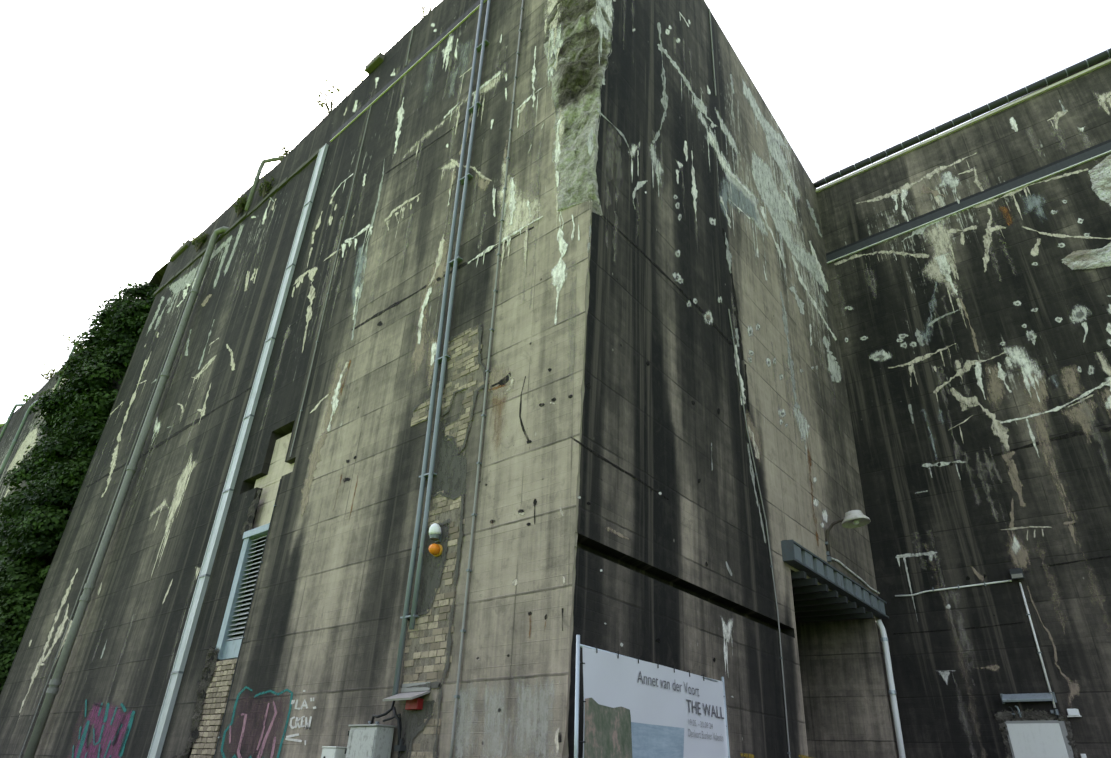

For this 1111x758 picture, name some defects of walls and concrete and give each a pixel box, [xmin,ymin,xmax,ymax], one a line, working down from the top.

spalling [544,0,613,226]
efflorescence [597,93,698,220]
peeling [1058,218,1111,270]
peeling [1088,155,1111,206]
flaking render [411,323,513,454]
crack [519,376,532,448]
efflorescence [809,324,841,390]
damp [835,153,1111,517]
peeling [1055,306,1088,323]
damp [18,568,85,720]
flaking render [401,490,465,758]
damp [896,551,937,621]